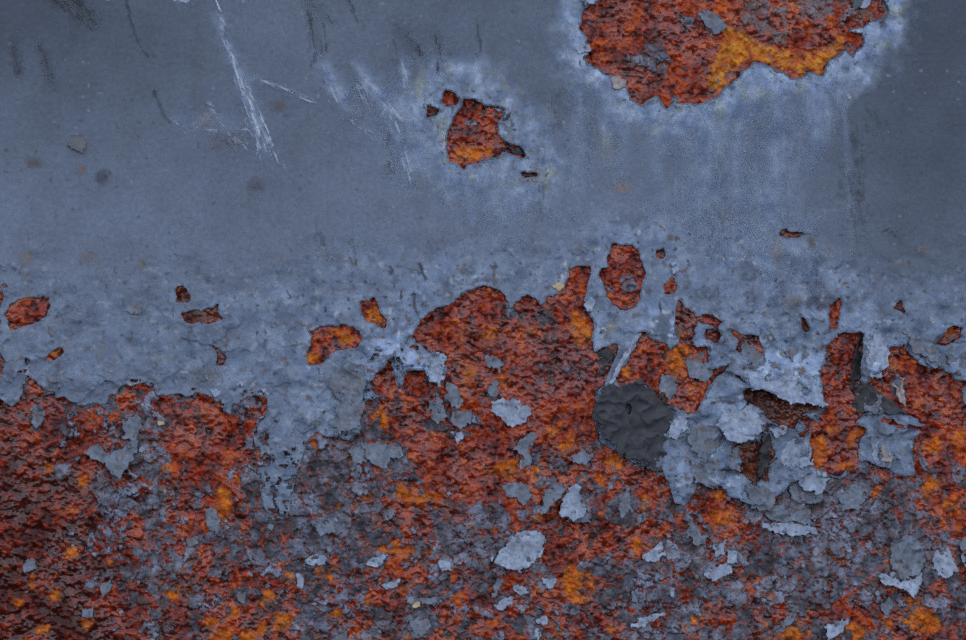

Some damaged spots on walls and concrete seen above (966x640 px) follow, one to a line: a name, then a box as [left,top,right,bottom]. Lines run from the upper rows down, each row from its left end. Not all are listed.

rust [574,0,888,108]
rust [426,90,525,169]
peeling [583,297,595,312]
peeling [658,374,678,401]
peeling [683,351,713,382]
peeling [740,336,828,408]
peeling [865,333,890,378]
rust [800,298,966,489]
peeling [902,330,966,375]
rust [0,243,765,640]
peeling [665,401,966,640]